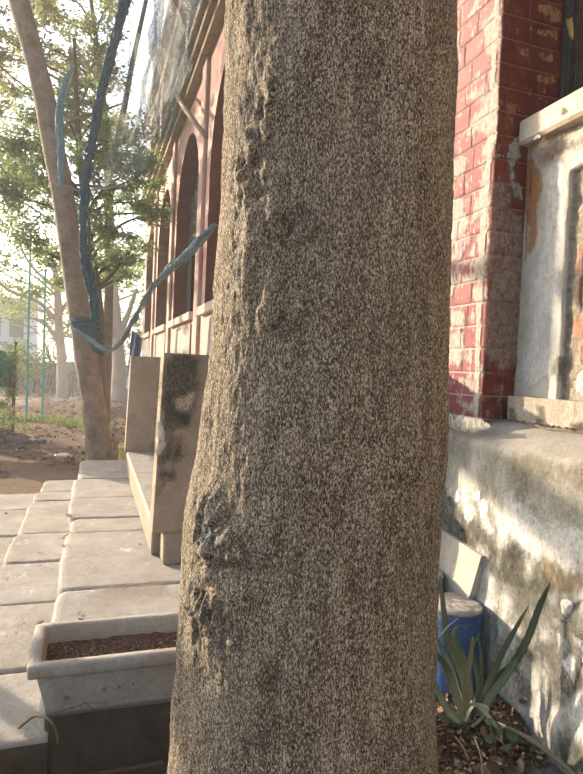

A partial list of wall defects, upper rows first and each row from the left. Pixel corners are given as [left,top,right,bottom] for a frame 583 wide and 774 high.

peeling [483,9,501,55]
peeling [467,84,504,159]
peeling [454,156,467,180]
peeling [449,160,565,387]
damp [160,351,200,427]
spalling [449,401,490,433]
damp [152,439,180,479]
damp [441,489,583,696]
damp [556,734,583,774]